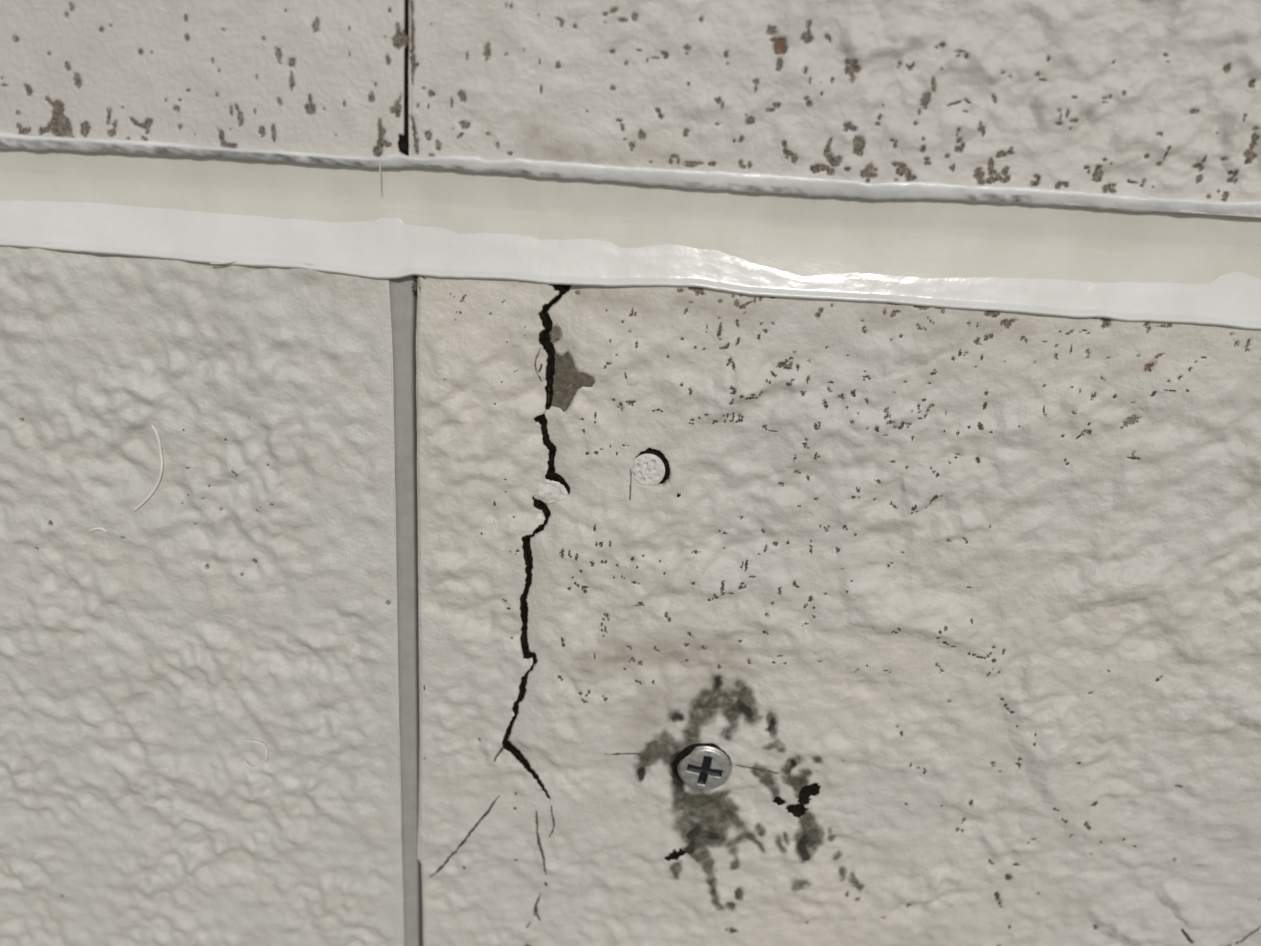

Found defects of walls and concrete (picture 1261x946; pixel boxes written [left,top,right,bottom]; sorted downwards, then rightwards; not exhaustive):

peeling [548,326,617,412]
crack [494,284,571,928]
crack [430,796,499,877]
water stain [637,676,863,909]